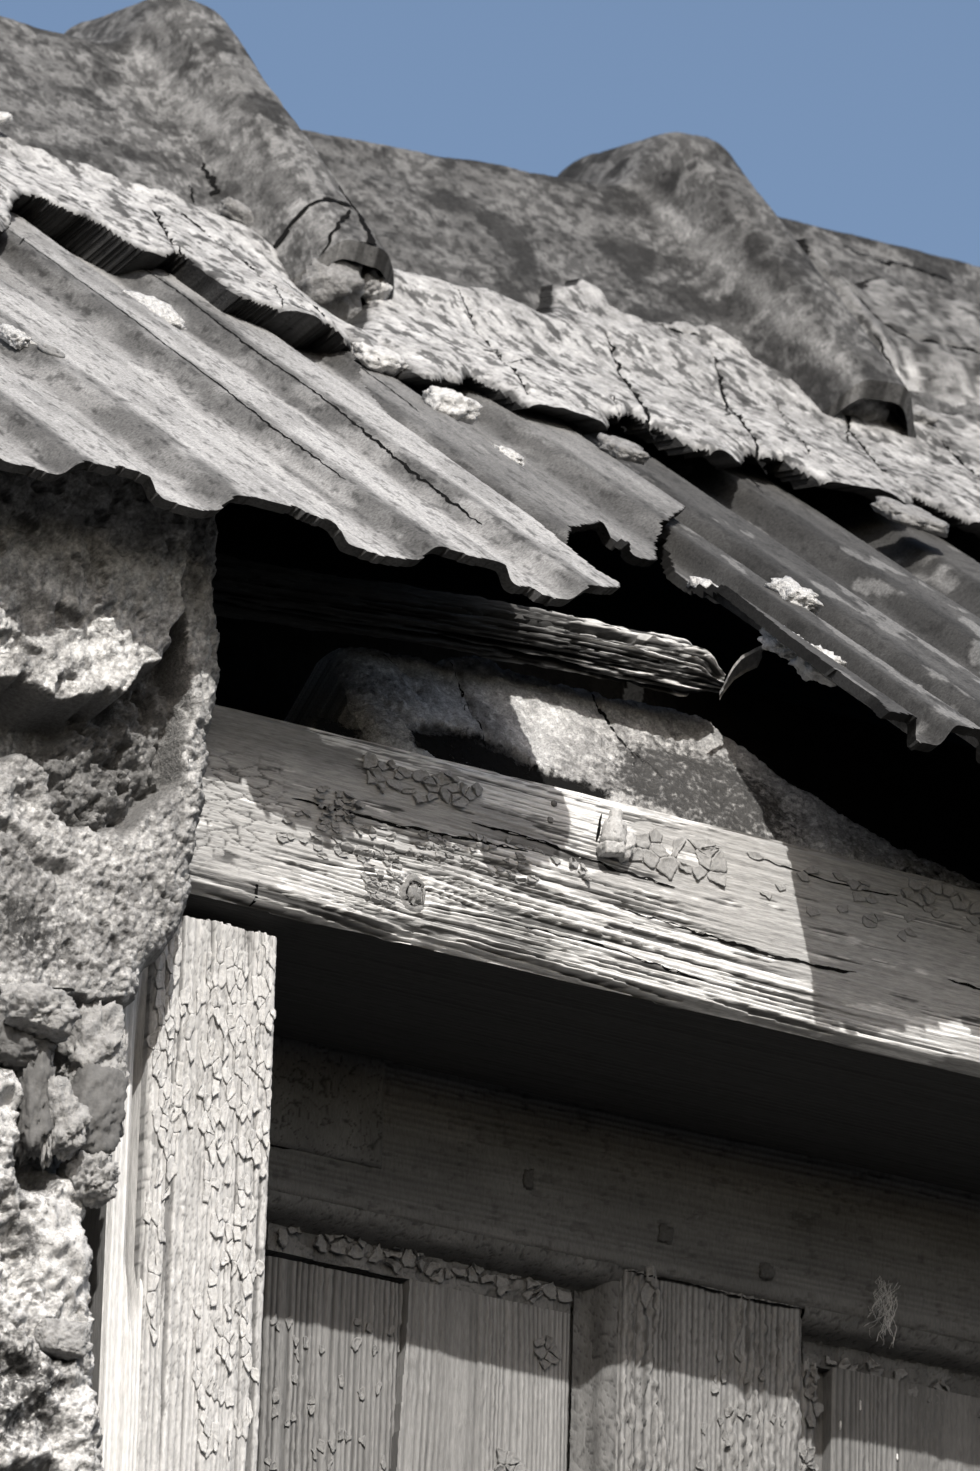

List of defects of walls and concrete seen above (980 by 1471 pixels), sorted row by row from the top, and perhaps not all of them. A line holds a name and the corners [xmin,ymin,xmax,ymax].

crack [144,163,482,524]
crack [458,289,545,395]
crack [607,337,657,440]
crack [658,324,810,475]
crack [845,415,887,472]
peeling [362,752,483,808]
peeling [276,785,592,908]
peeling [629,827,728,887]
peeling [142,934,325,1459]
peeling [277,1226,573,1304]
peeling [487,1447,529,1471]